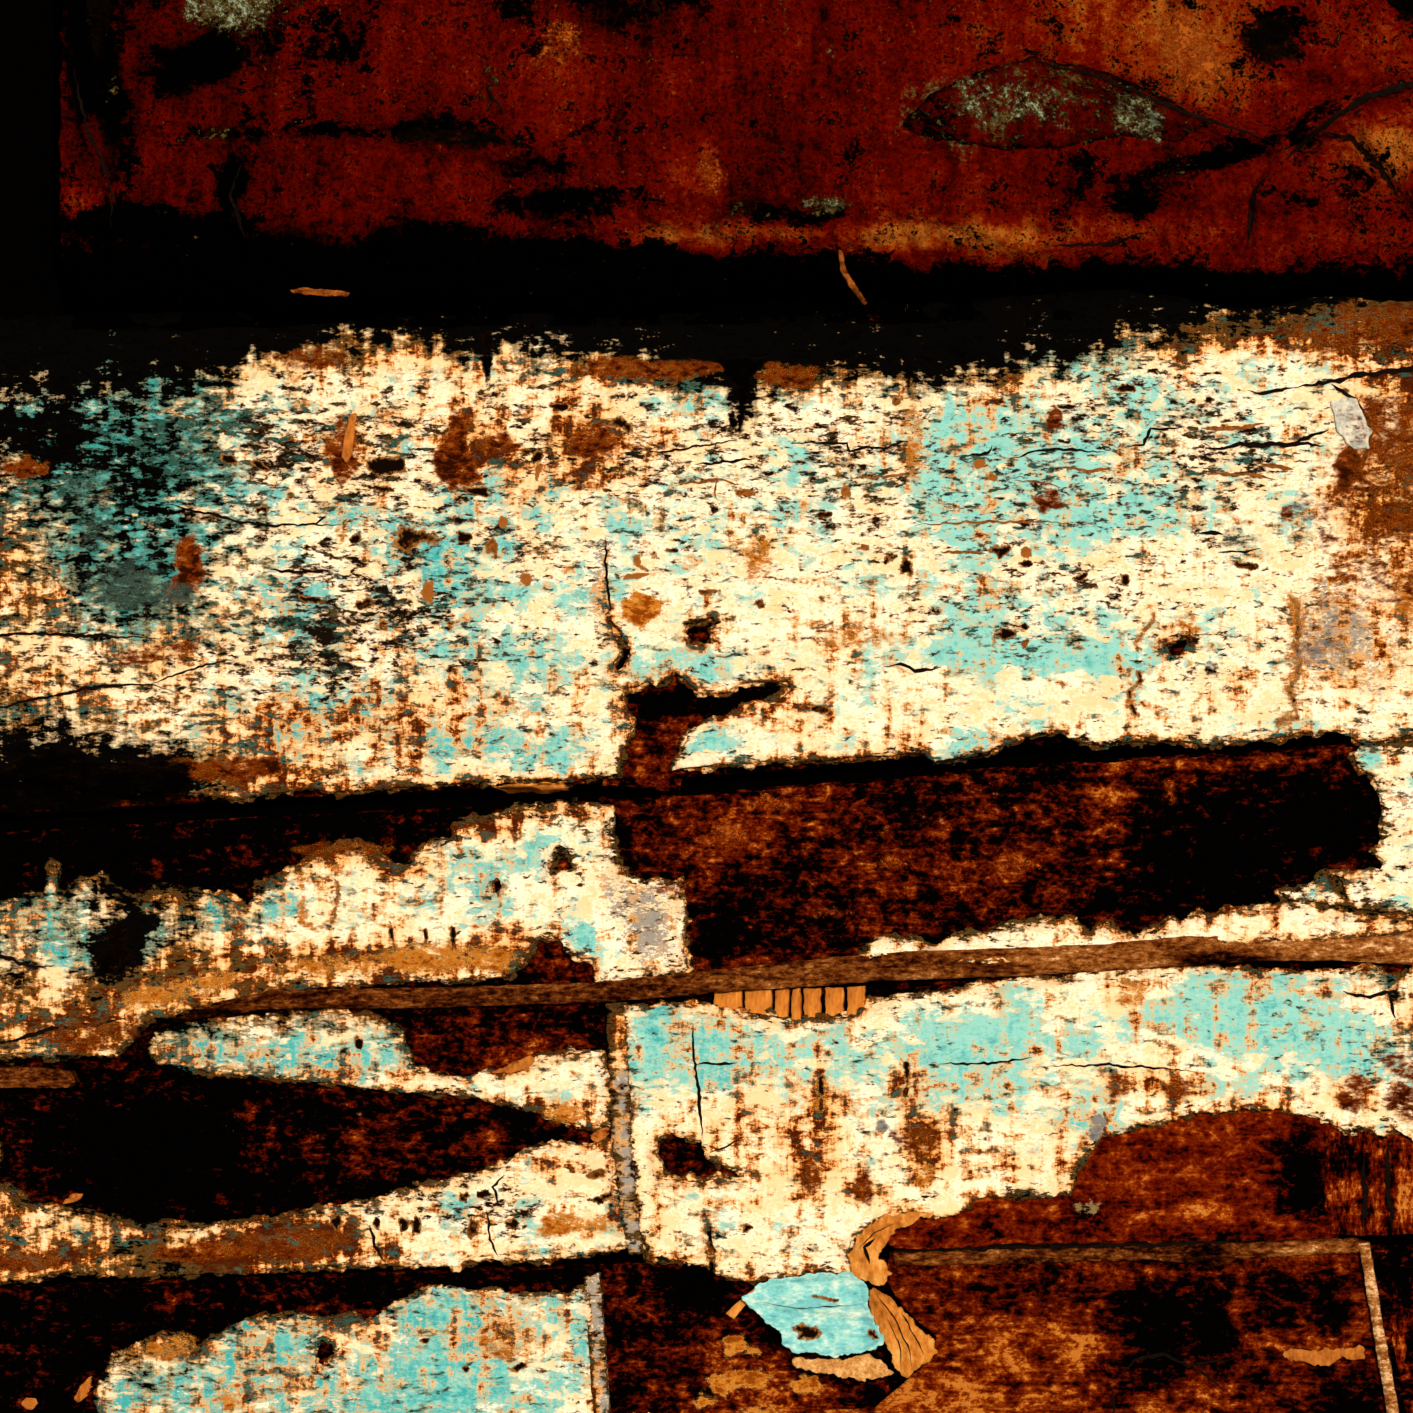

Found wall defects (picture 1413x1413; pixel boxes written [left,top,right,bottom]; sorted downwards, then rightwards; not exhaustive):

corrosion [57,0,1413,360]
corrosion [432,407,522,493]
corrosion [565,421,619,459]
crack [603,537,611,615]
crack [915,365,1413,554]
corrosion [1280,391,1413,632]
peeling [0,674,1382,972]
peeling [380,1001,613,1077]
peeling [506,940,595,985]
peeling [0,1058,611,1240]
peeling [0,1108,1341,1413]
corrosion [849,1169,874,1206]